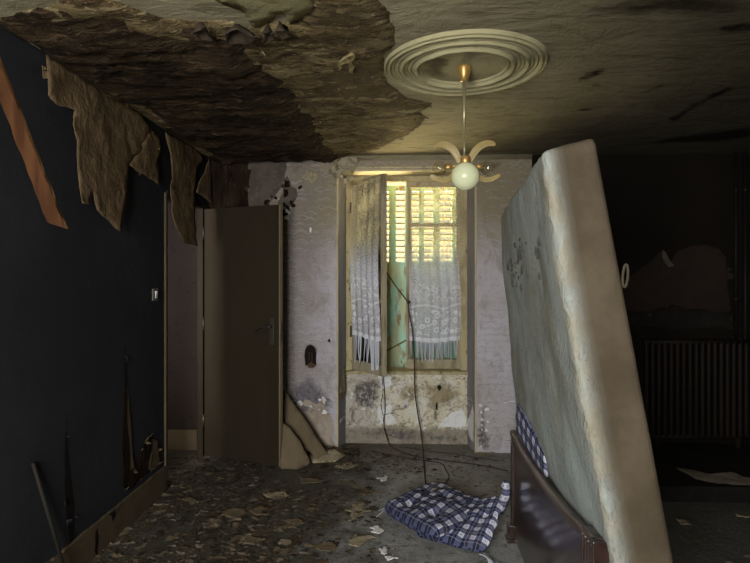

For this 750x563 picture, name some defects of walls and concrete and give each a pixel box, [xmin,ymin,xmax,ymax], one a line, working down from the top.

flaking render [0,0,360,218]
flaking render [292,396,341,450]